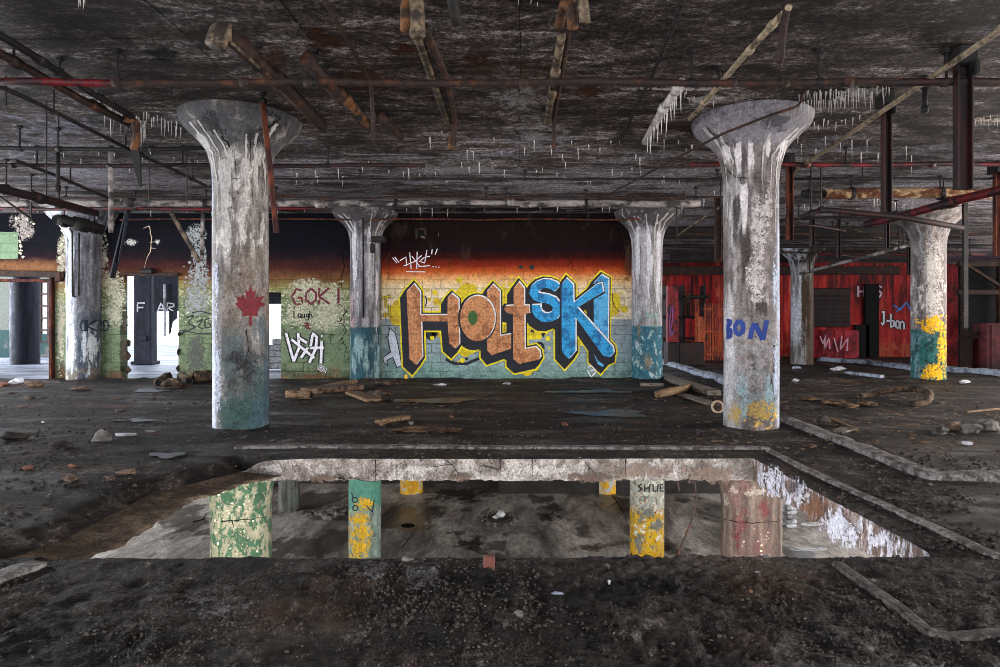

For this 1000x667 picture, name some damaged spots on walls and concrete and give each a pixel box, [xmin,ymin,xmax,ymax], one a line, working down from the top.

corrosion [302,27,352,56]
damp [684,87,731,116]
damp [189,110,288,239]
damp [702,112,807,280]
damp [756,302,767,316]
peeling [915,236,947,380]
peeling [214,483,265,554]
peeling [351,497,375,555]
peeling [633,505,663,555]